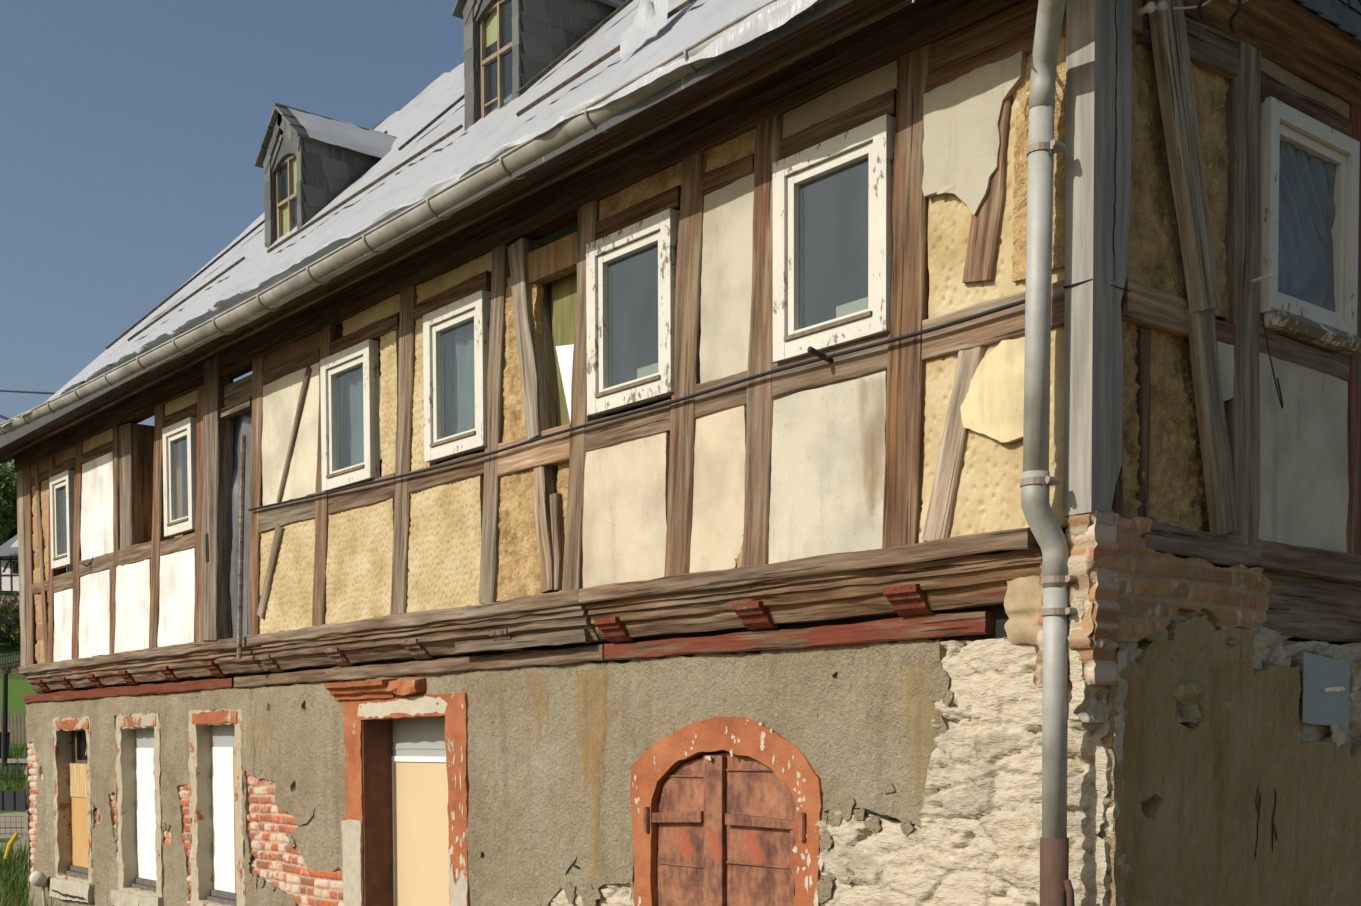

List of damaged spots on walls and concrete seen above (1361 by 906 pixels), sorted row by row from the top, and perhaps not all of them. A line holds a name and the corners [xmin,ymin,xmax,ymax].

flaking render [1004,563,1043,688]
flaking render [1065,510,1361,748]
flaking render [25,740,58,873]
flaking render [156,752,199,906]
flaking render [237,745,363,906]